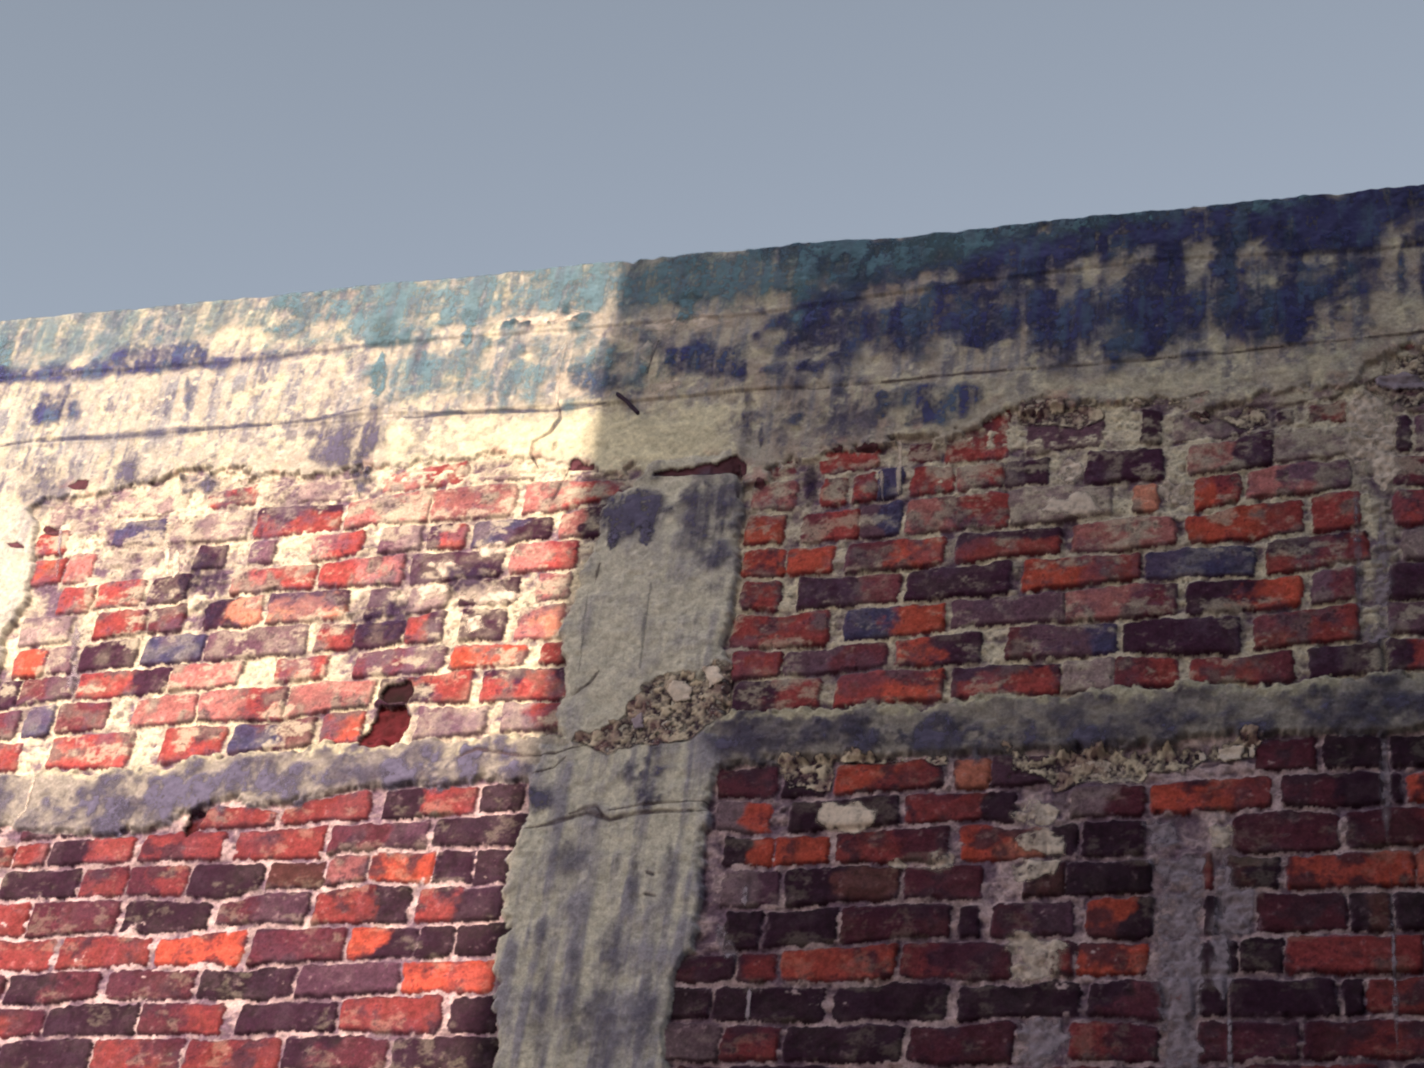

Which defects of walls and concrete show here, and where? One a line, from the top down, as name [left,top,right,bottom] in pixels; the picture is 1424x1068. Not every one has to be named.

leakage [0,184,1424,504]
flaking render [69,479,89,490]
crack [0,423,271,447]
crack [305,409,359,422]
crack [404,402,623,500]
flaking render [43,526,60,535]
spalling [359,680,414,748]
flaking render [574,659,733,755]
leakage [0,736,552,838]
crack [522,801,709,829]
leakage [818,802,874,833]
leakage [1013,800,1064,881]